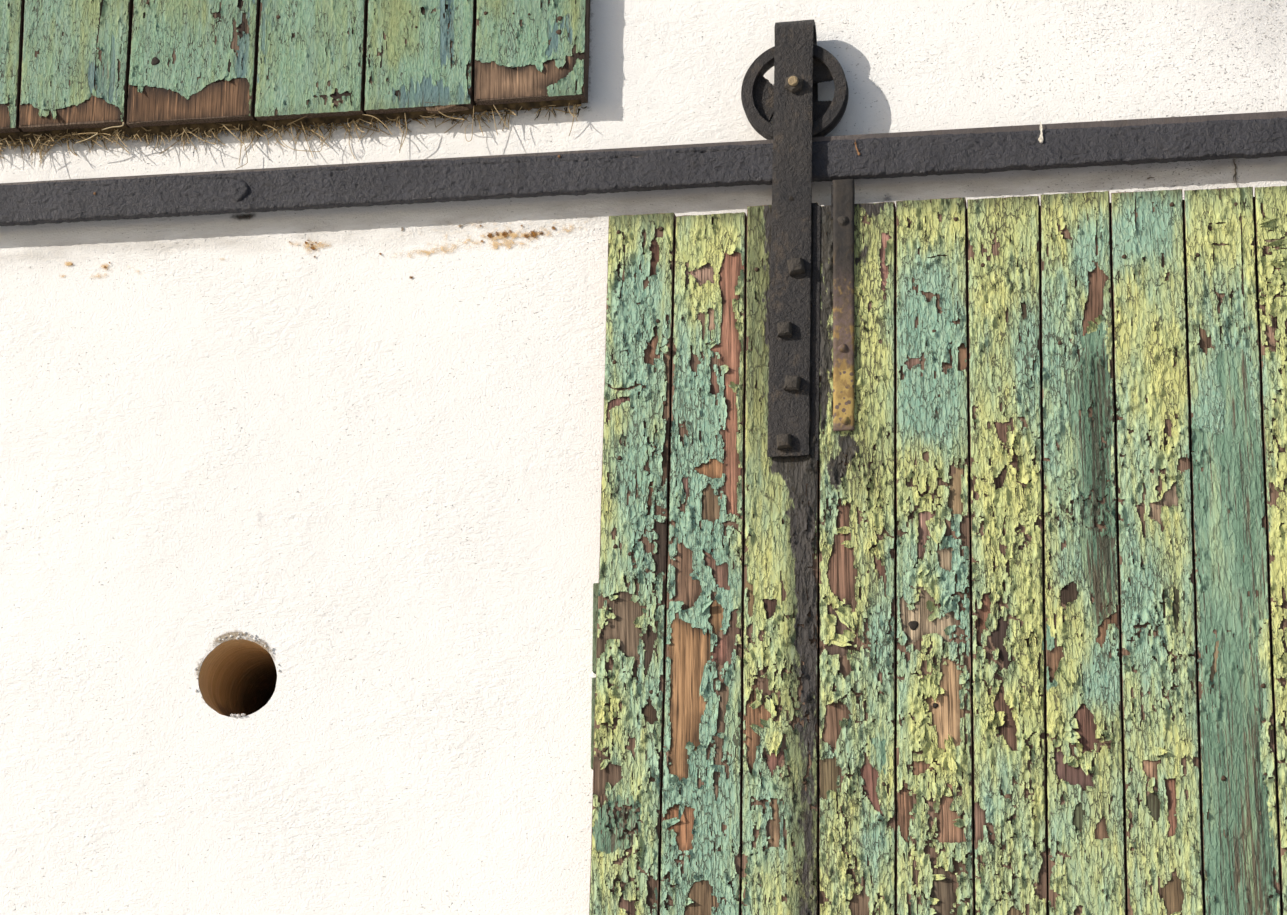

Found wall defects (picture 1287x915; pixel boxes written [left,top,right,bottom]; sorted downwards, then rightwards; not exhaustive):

corrosion [410,225,571,258]